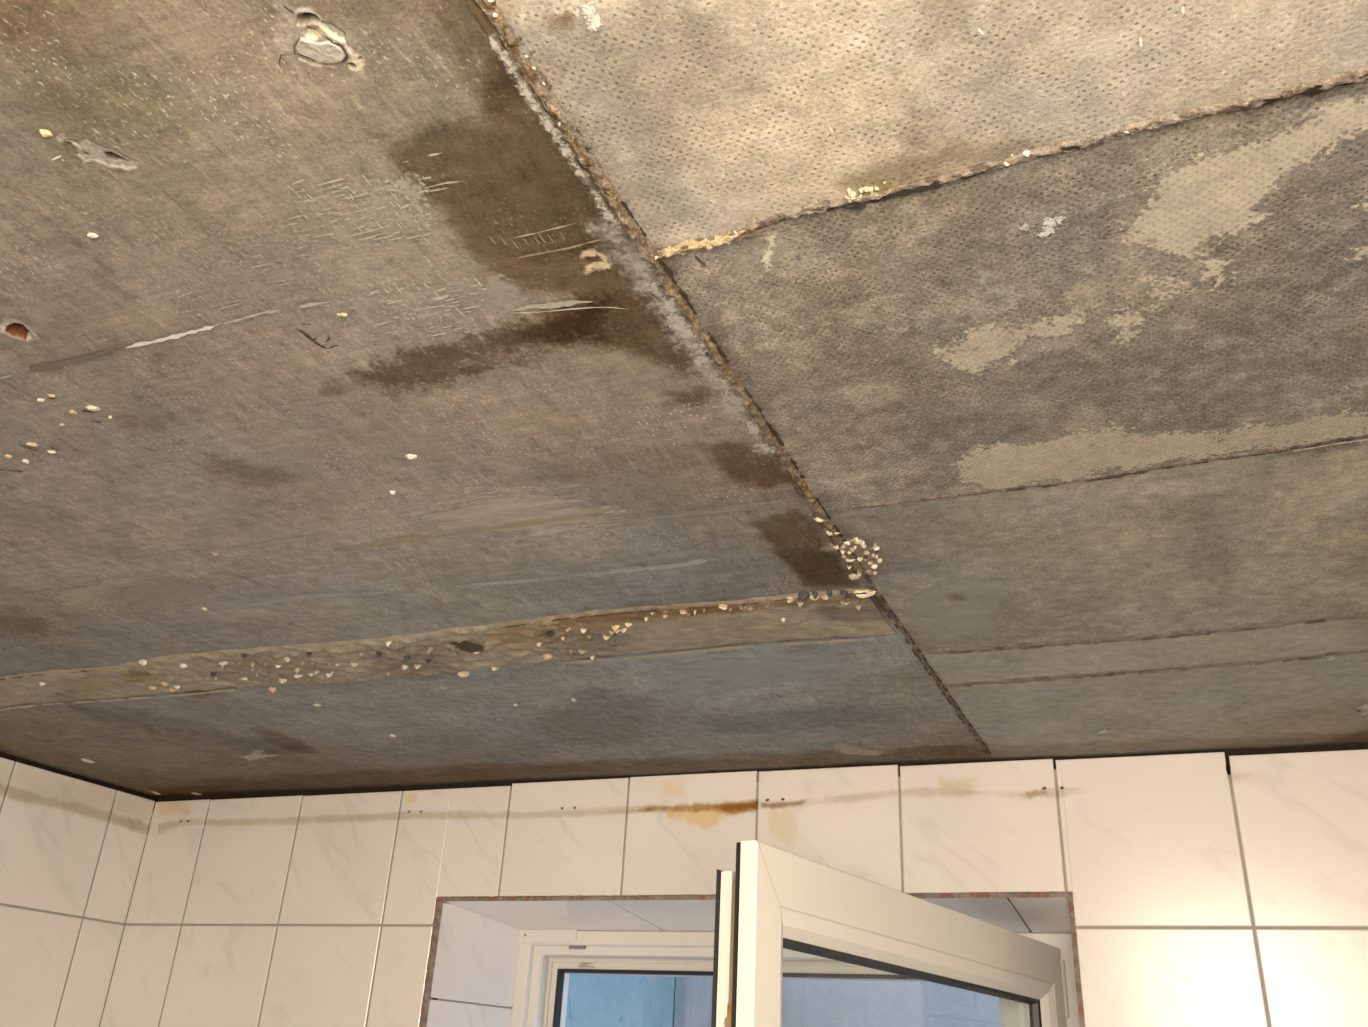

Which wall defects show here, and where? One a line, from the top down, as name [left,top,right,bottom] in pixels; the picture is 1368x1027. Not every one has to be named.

spalling [210,0,425,104]
water stain [489,19,775,454]